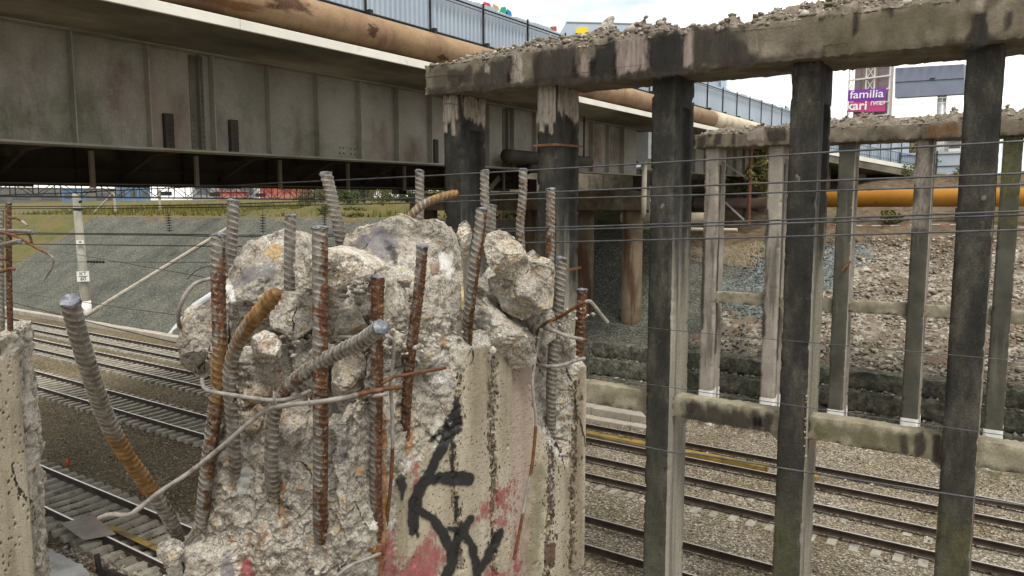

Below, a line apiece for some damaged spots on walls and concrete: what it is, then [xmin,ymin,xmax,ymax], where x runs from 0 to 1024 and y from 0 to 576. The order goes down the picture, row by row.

leakage [962,12,993,49]
leakage [427,31,710,135]
leakage [730,51,823,79]
leakage [902,431,941,464]
rust [369,413,388,576]